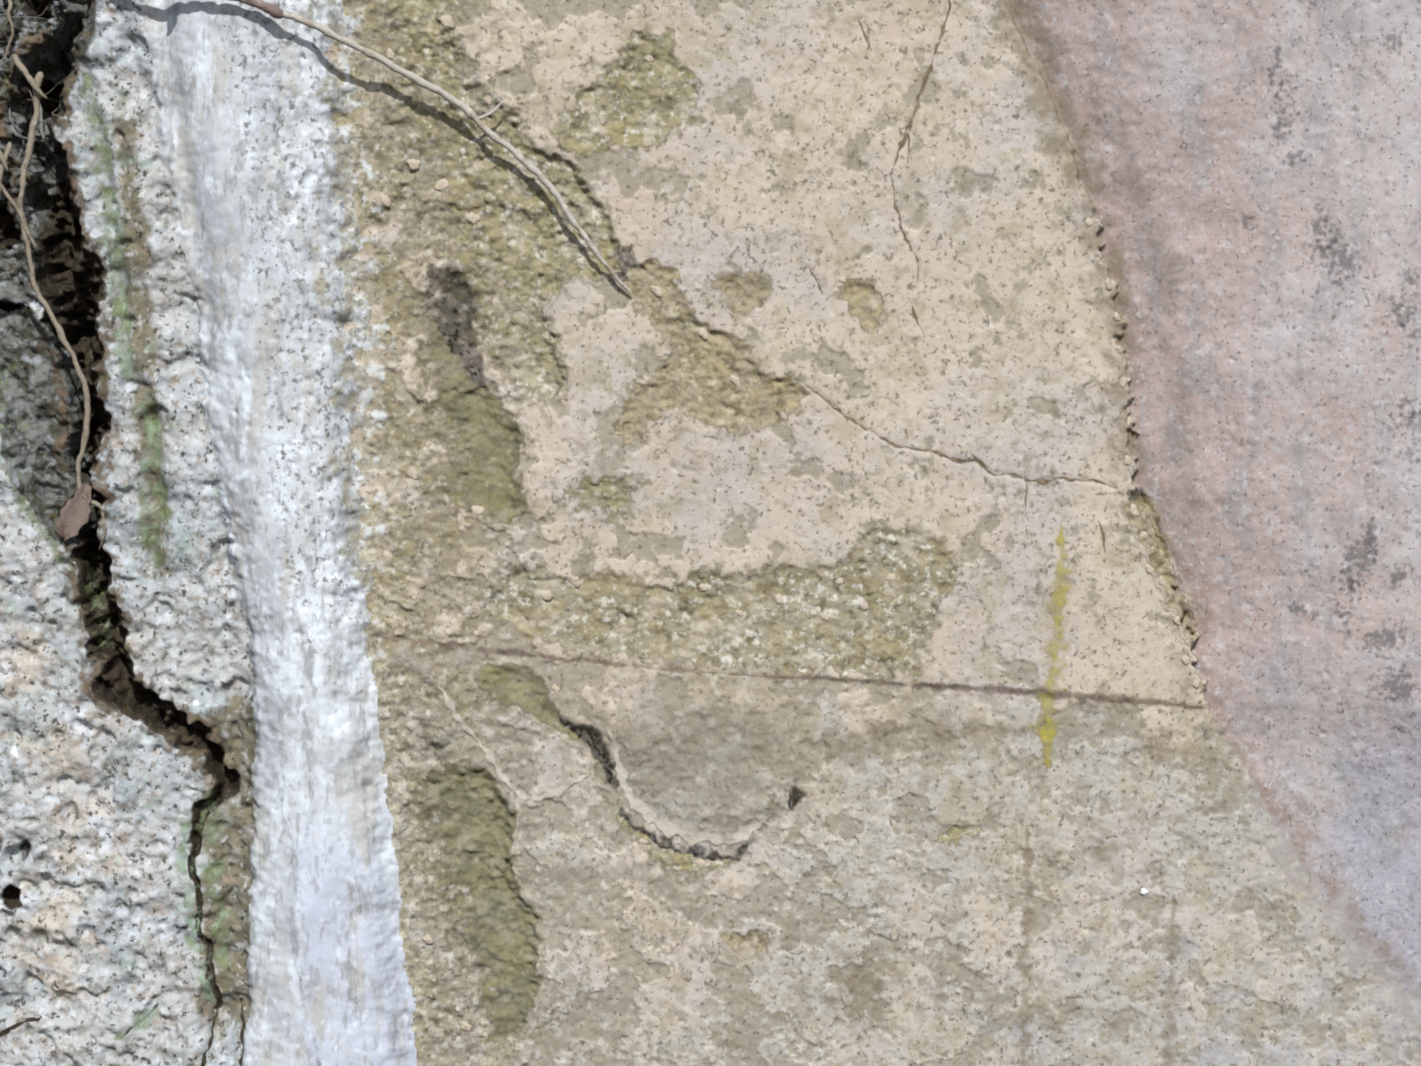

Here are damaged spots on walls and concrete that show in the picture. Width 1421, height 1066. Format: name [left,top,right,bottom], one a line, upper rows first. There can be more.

damp [89,114,134,382]
flaking render [346,0,810,529]
flaking render [838,277,888,333]
crack [891,0,951,336]
damp [80,578,109,650]
crack [0,0,245,1066]
damp [138,390,172,578]
flaking render [377,519,963,792]
crack [793,378,1108,508]
crack [940,684,1018,694]
damp [176,789,230,1002]
flaking render [616,811,742,872]